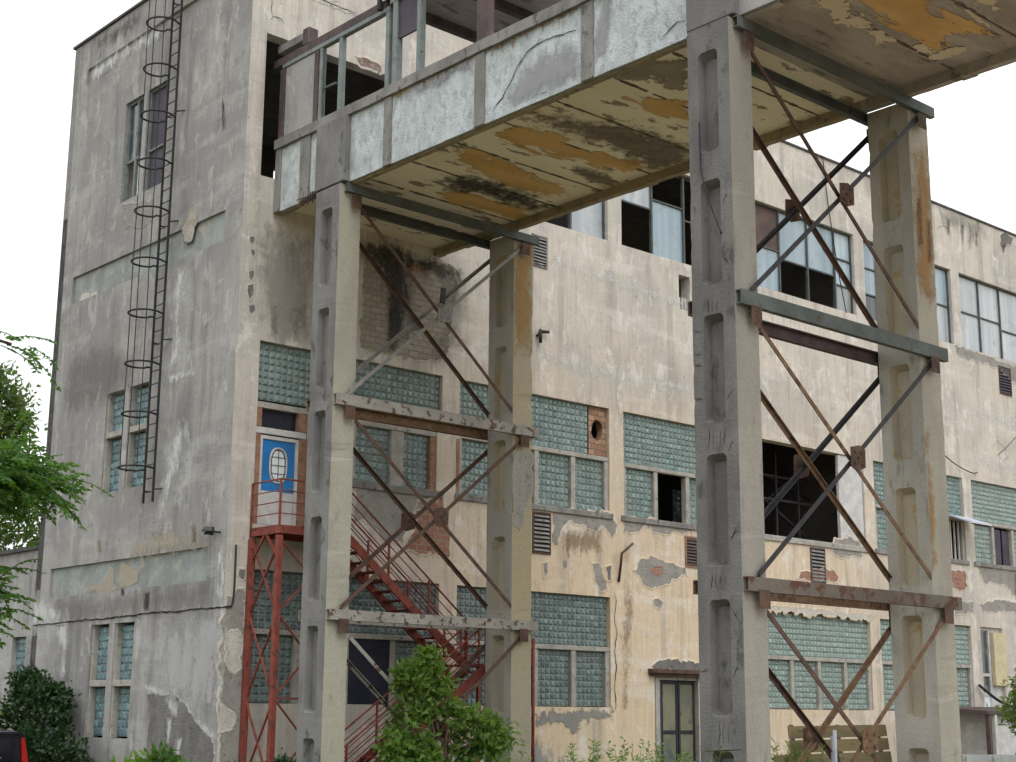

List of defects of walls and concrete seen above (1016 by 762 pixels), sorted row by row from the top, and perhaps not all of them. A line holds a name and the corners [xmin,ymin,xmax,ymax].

peeling [814,0,1006,60]
crack [494,30,575,108]
peeling [613,58,689,120]
peeling [453,147,568,196]
peeling [495,126,649,173]
rust [913,153,935,297]
leakage [361,243,460,351]
spalling [551,506,693,549]
spalling [590,562,613,594]
spalling [632,554,688,610]
spalling [144,567,247,762]
peeling [535,705,614,735]